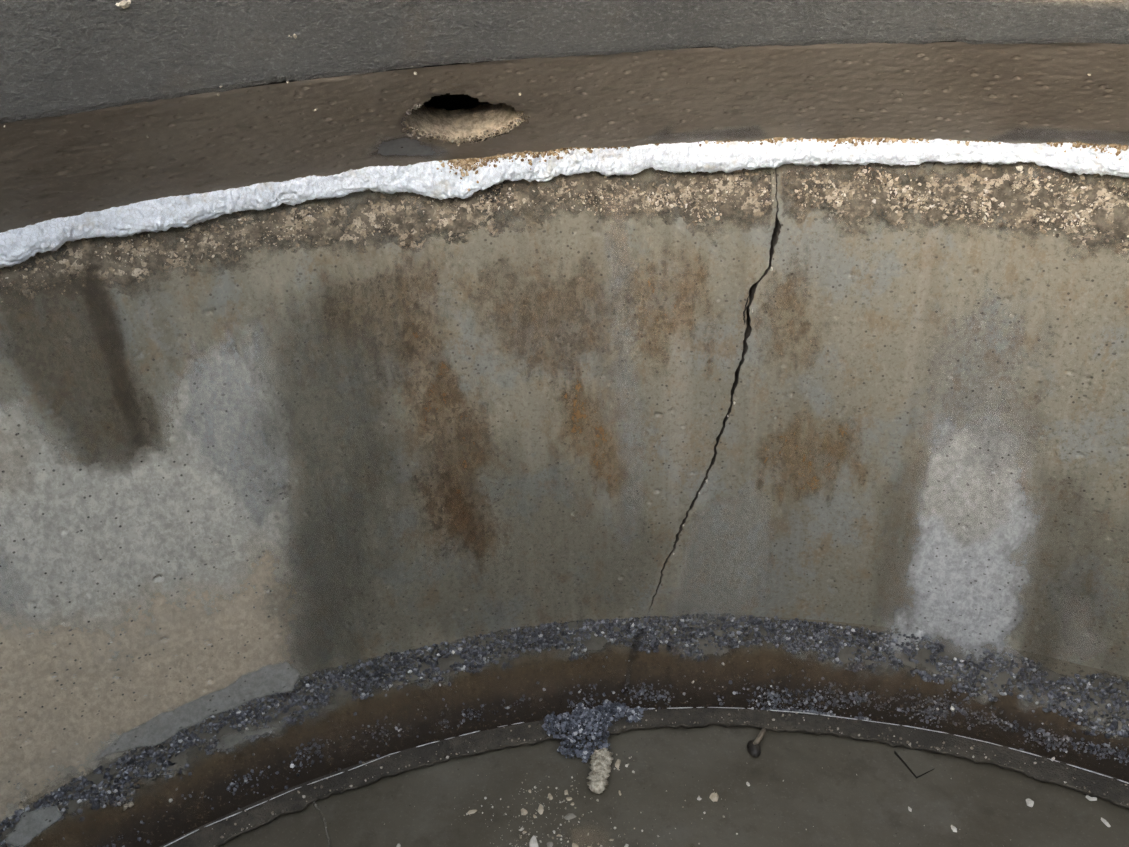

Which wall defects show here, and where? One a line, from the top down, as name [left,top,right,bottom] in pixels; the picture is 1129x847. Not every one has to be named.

spalling [400,93,531,146]
leakage [0,269,373,823]
corrosion [324,269,491,567]
corrosion [469,257,624,498]
crack [627,168,781,685]
leakage [891,418,1036,655]